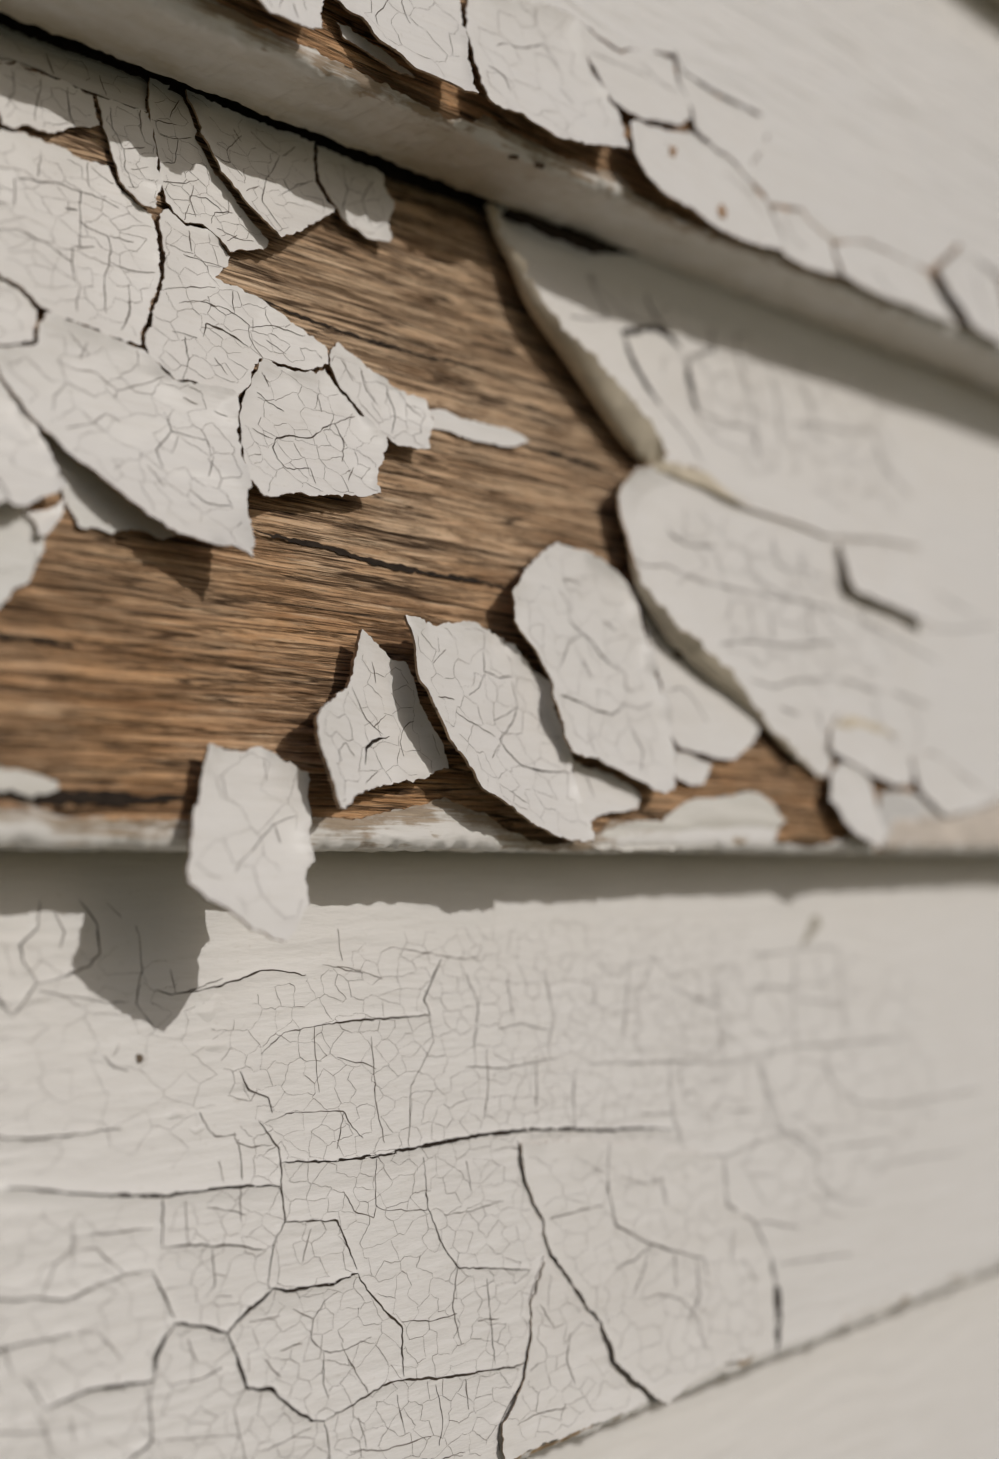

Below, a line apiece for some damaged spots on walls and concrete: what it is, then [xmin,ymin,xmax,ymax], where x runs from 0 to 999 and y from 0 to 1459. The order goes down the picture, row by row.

crack [369,0,760,135]
peeling [214,0,999,344]
peeling [0,62,999,942]
crack [197,752,302,919]
crack [325,554,707,829]
crack [0,901,934,1459]